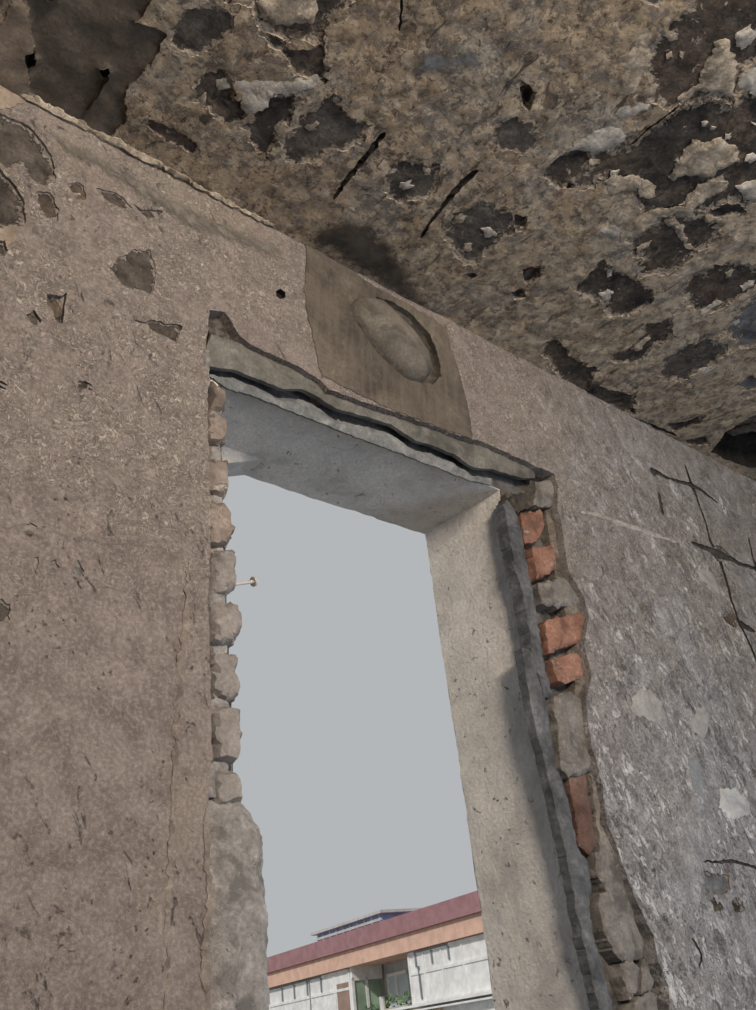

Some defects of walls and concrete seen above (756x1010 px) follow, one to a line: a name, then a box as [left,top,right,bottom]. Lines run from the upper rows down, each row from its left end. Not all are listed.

crack [396,0,404,31]
peeling [186,0,372,164]
crack [333,132,386,200]
peeling [382,159,441,204]
crack [420,170,478,238]
peeling [443,200,531,267]
peeling [490,116,540,156]
peeling [541,0,756,383]
spalling [110,249,156,294]
spalling [665,415,756,468]
crack [650,465,756,661]
flaking render [204,318,658,1010]